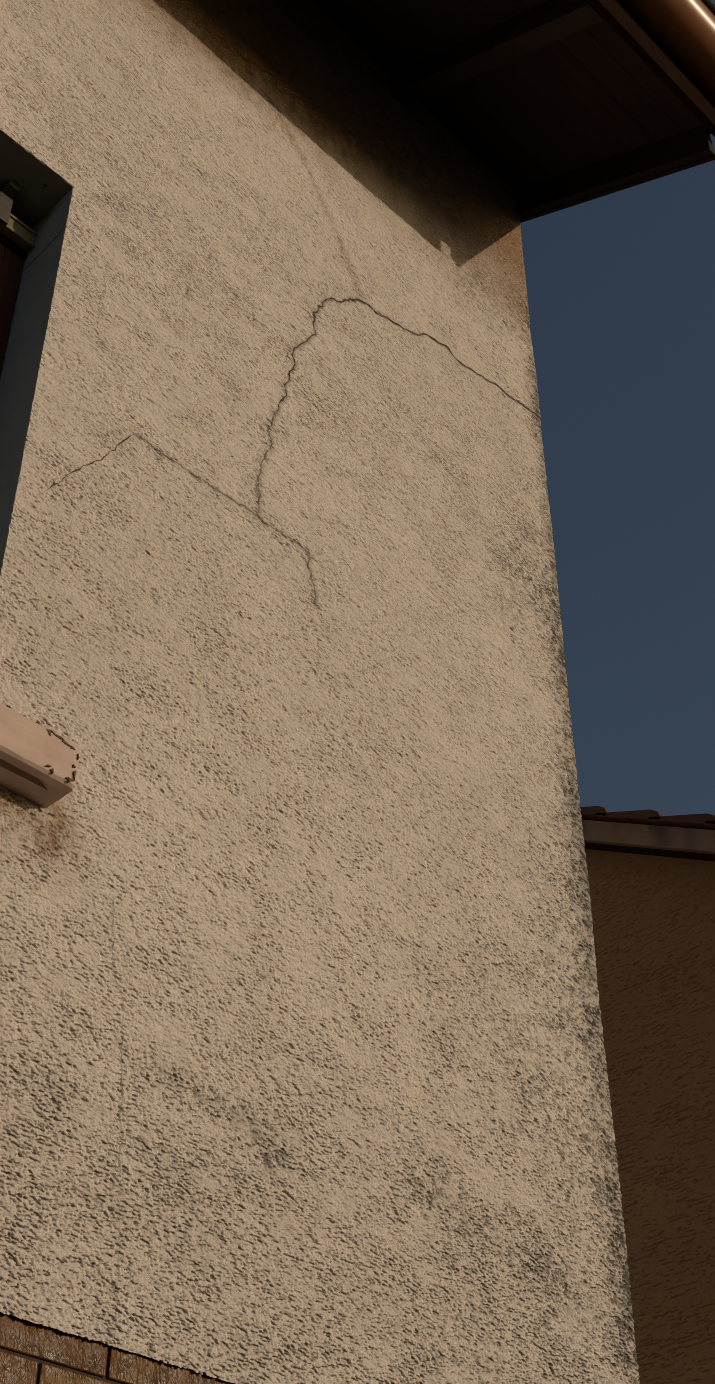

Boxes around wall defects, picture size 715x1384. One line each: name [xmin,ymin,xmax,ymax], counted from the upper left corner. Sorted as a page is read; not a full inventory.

crack [44,298,540,606]